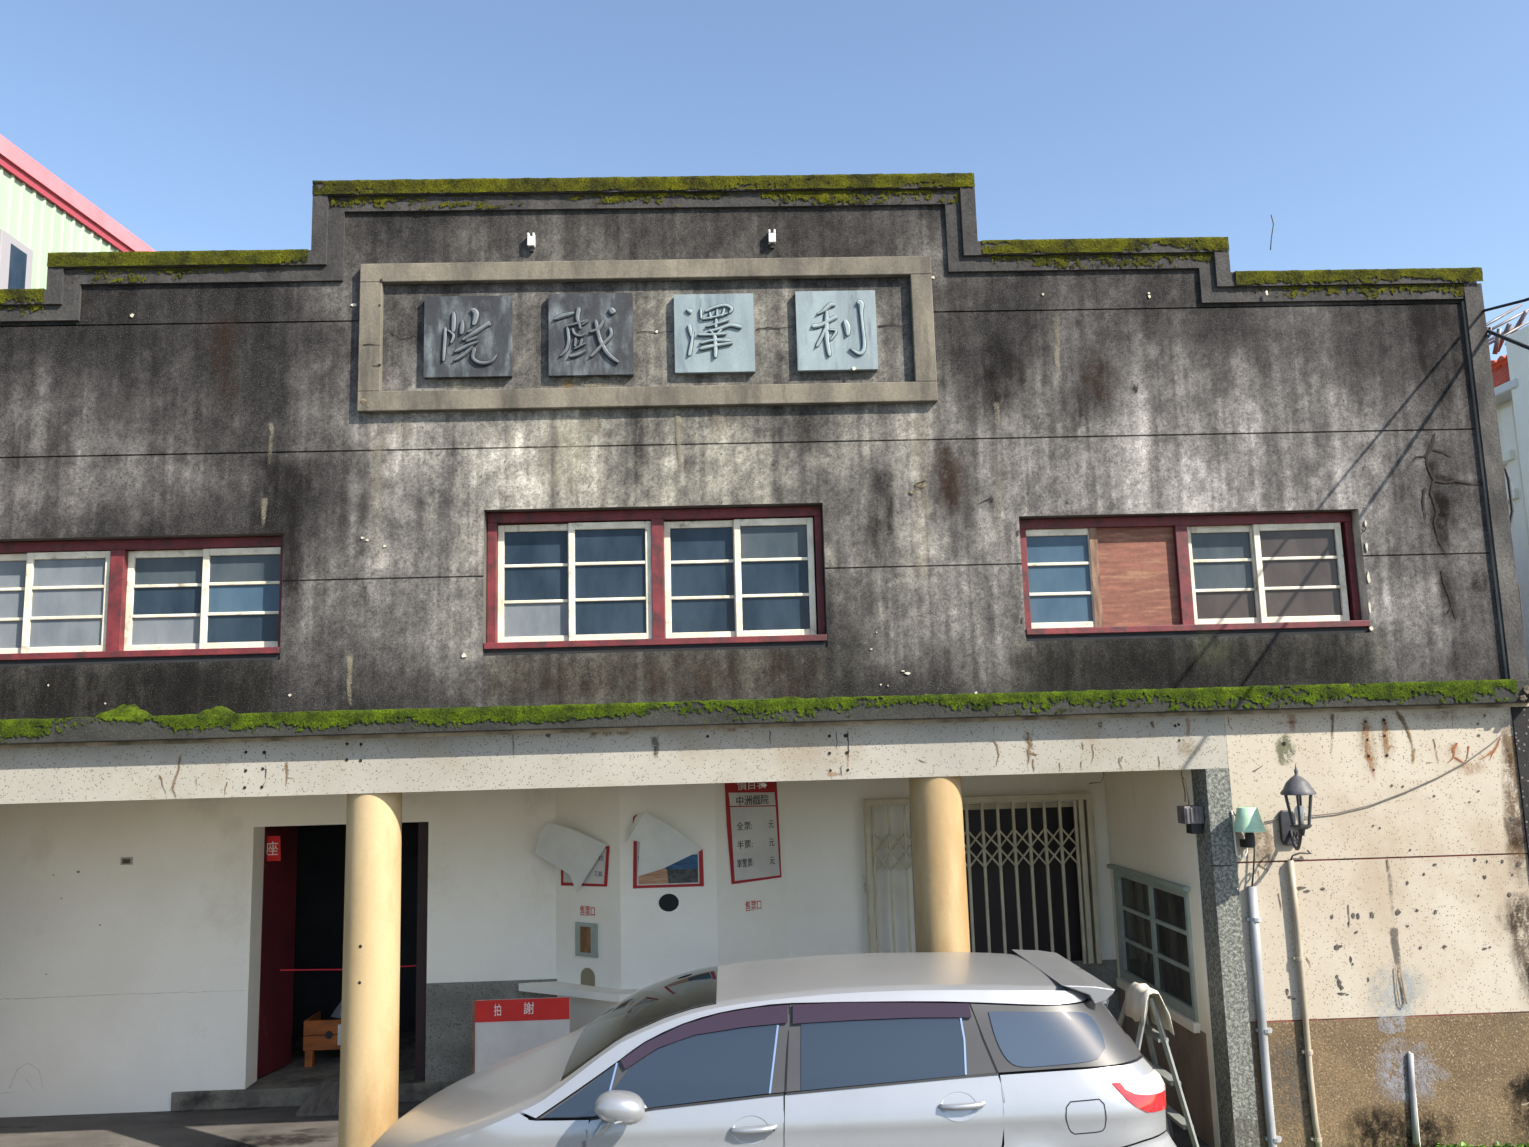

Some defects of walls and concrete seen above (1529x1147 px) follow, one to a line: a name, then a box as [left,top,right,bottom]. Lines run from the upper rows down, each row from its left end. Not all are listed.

leakage [1429,463,1470,542]
leakage [1508,899,1529,986]
leakage [1358,1112,1441,1147]
leakage [1512,1078,1529,1139]